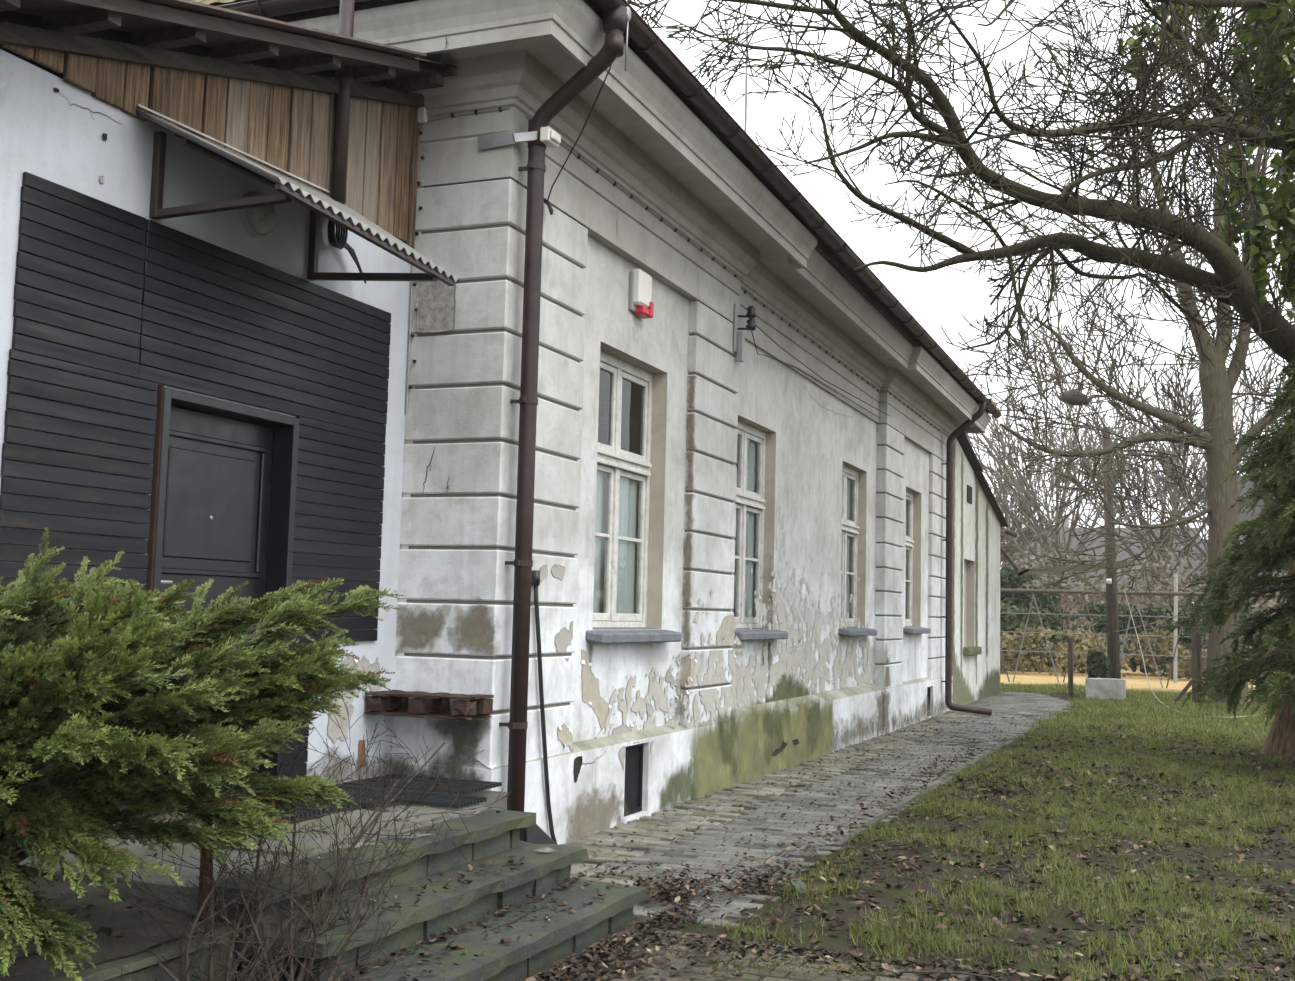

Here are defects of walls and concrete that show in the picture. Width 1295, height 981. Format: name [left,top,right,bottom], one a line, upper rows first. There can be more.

peeling [324,655,381,767]
peeling [555,553,876,770]